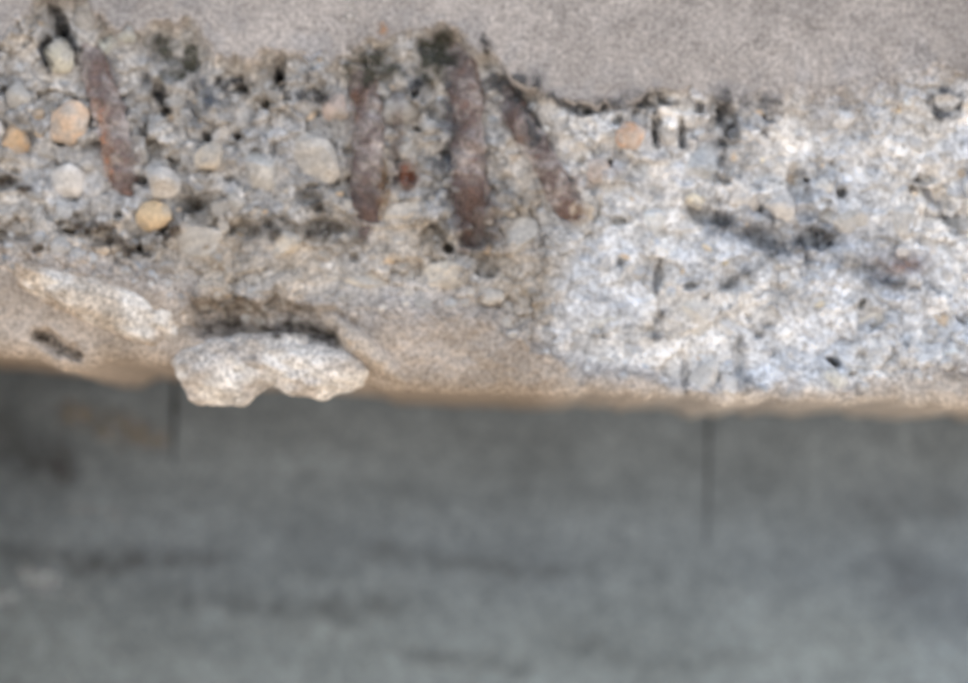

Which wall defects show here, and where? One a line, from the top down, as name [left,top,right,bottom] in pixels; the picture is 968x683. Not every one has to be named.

corrosion [75,43,140,197]
spalling [0,0,570,359]
corrosion [349,64,414,238]
corrosion [444,42,491,247]
corrosion [498,85,581,220]